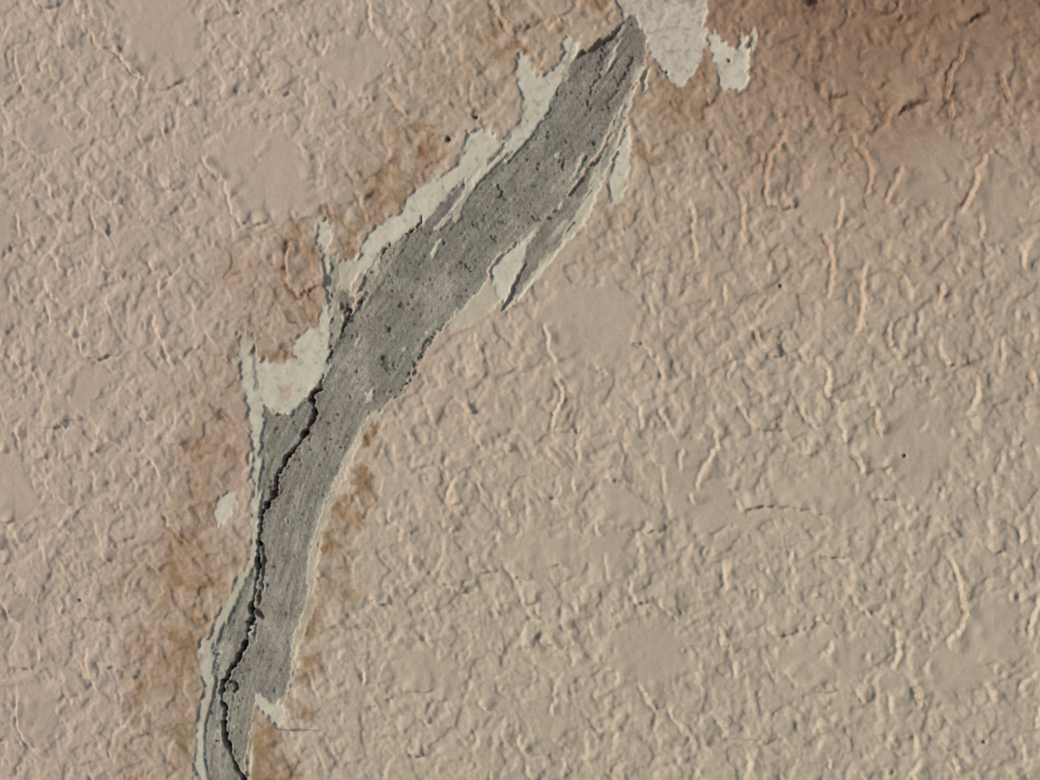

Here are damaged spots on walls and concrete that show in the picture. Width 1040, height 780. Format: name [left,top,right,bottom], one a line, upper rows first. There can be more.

crack [215,295,364,780]
leakage [77,0,621,780]
crack [380,214,424,259]
spalling [189,0,760,780]
leakage [571,0,1040,477]